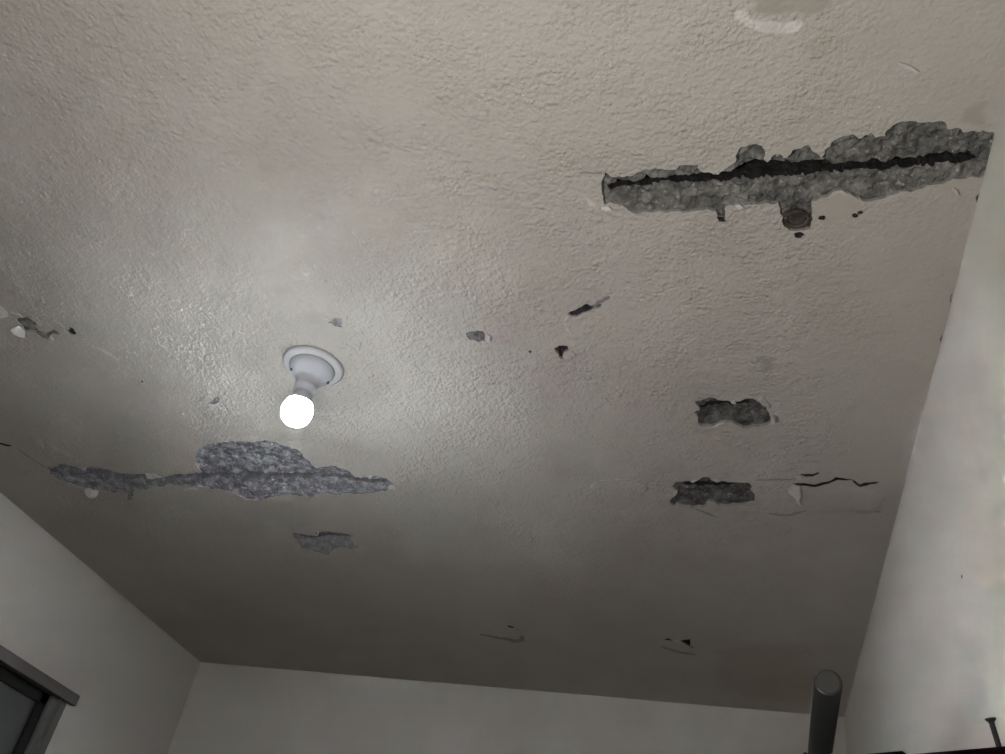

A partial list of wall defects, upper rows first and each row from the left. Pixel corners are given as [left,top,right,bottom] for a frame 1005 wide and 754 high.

spalling [579,96,998,238]
spalling [569,304,601,315]
spalling [0,306,130,365]
spalling [466,331,492,344]
spalling [554,345,575,360]
spalling [694,397,775,428]
spalling [47,440,396,501]
spalling [669,477,755,518]
crack [755,472,879,517]
spalling [292,531,375,556]